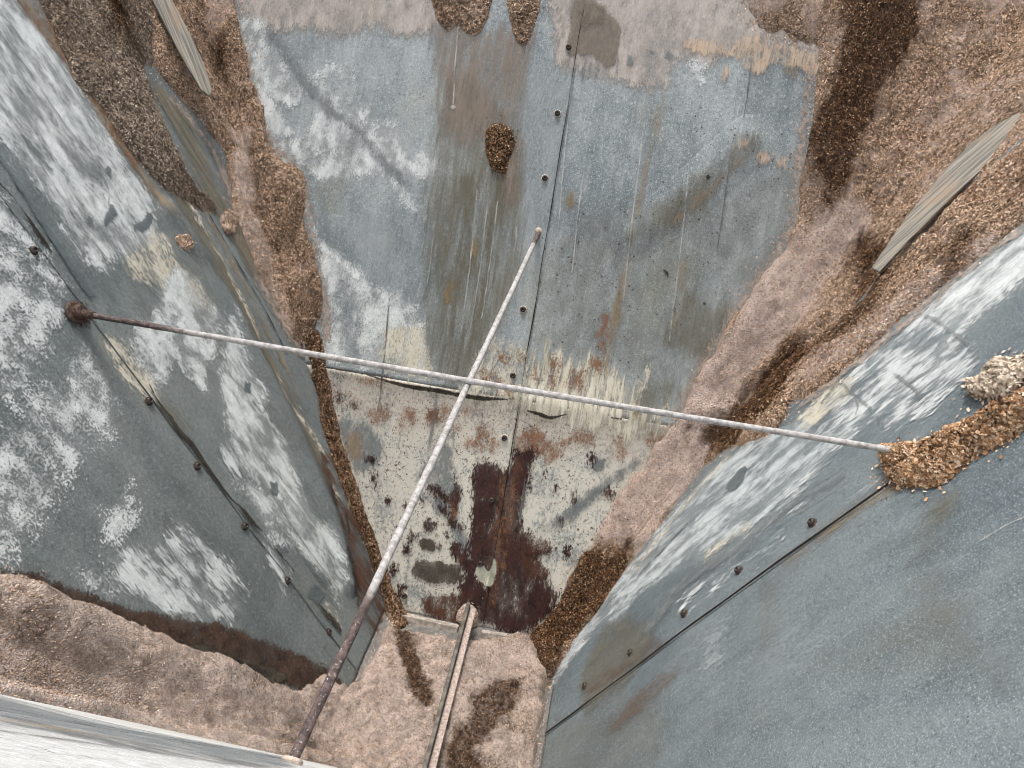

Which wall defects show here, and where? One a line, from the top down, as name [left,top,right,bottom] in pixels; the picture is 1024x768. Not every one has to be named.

corrosion [20,0,73,76]
corrosion [83,90,638,634]
damp [427,21,533,382]
corrosion [0,568,342,690]